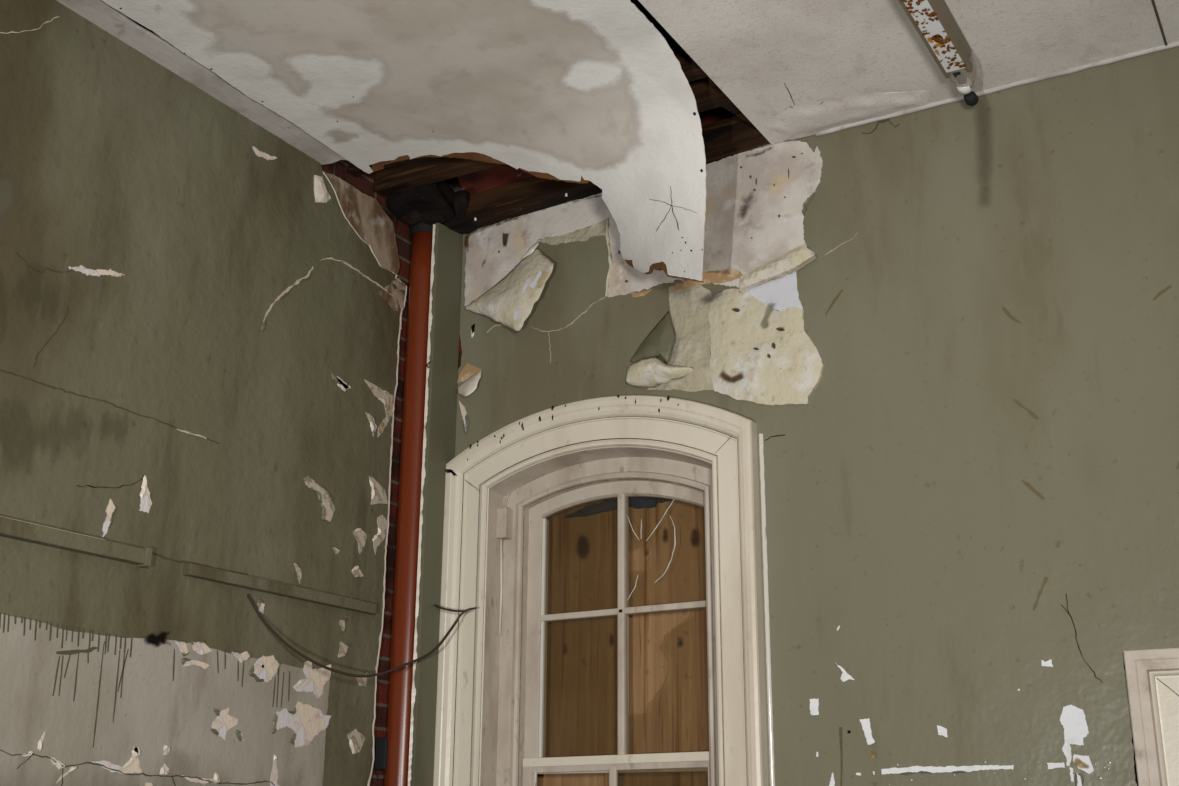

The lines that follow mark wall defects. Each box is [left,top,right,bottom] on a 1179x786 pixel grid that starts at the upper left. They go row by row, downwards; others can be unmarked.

rust [901,0,966,69]
damp [189,0,638,169]
peeling [68,265,124,277]
peeling [464,139,824,406]
crack [0,306,220,444]
peeling [140,475,152,513]
flaking render [314,172,407,786]
crack [0,749,275,786]
peeling [0,612,350,786]
spalling [860,718,875,745]
spalling [856,765,1014,776]
spalling [1047,705,1094,786]